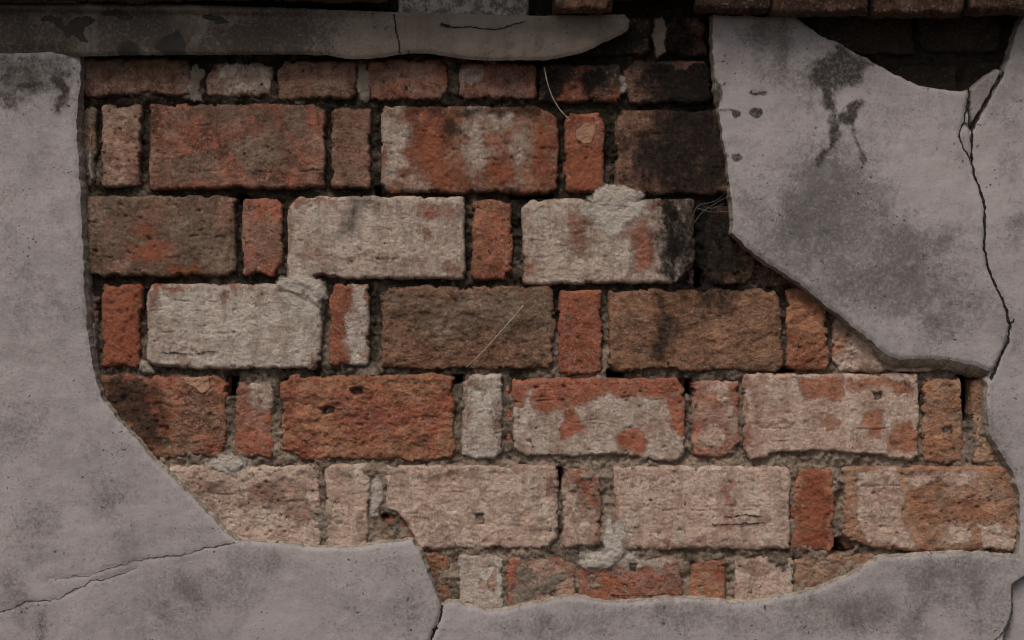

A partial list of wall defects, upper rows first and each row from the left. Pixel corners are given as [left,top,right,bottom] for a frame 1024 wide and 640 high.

crack [393,14,401,55]
crack [440,20,527,30]
water stain [811,44,874,166]
peeling [287,106,466,366]
peeling [521,122,695,286]
crack [958,69,1015,379]
peeling [146,283,324,370]
peeling [742,372,919,461]
peeling [170,464,322,545]
peeling [386,464,559,550]
peeling [513,389,791,569]
crack [0,542,235,613]